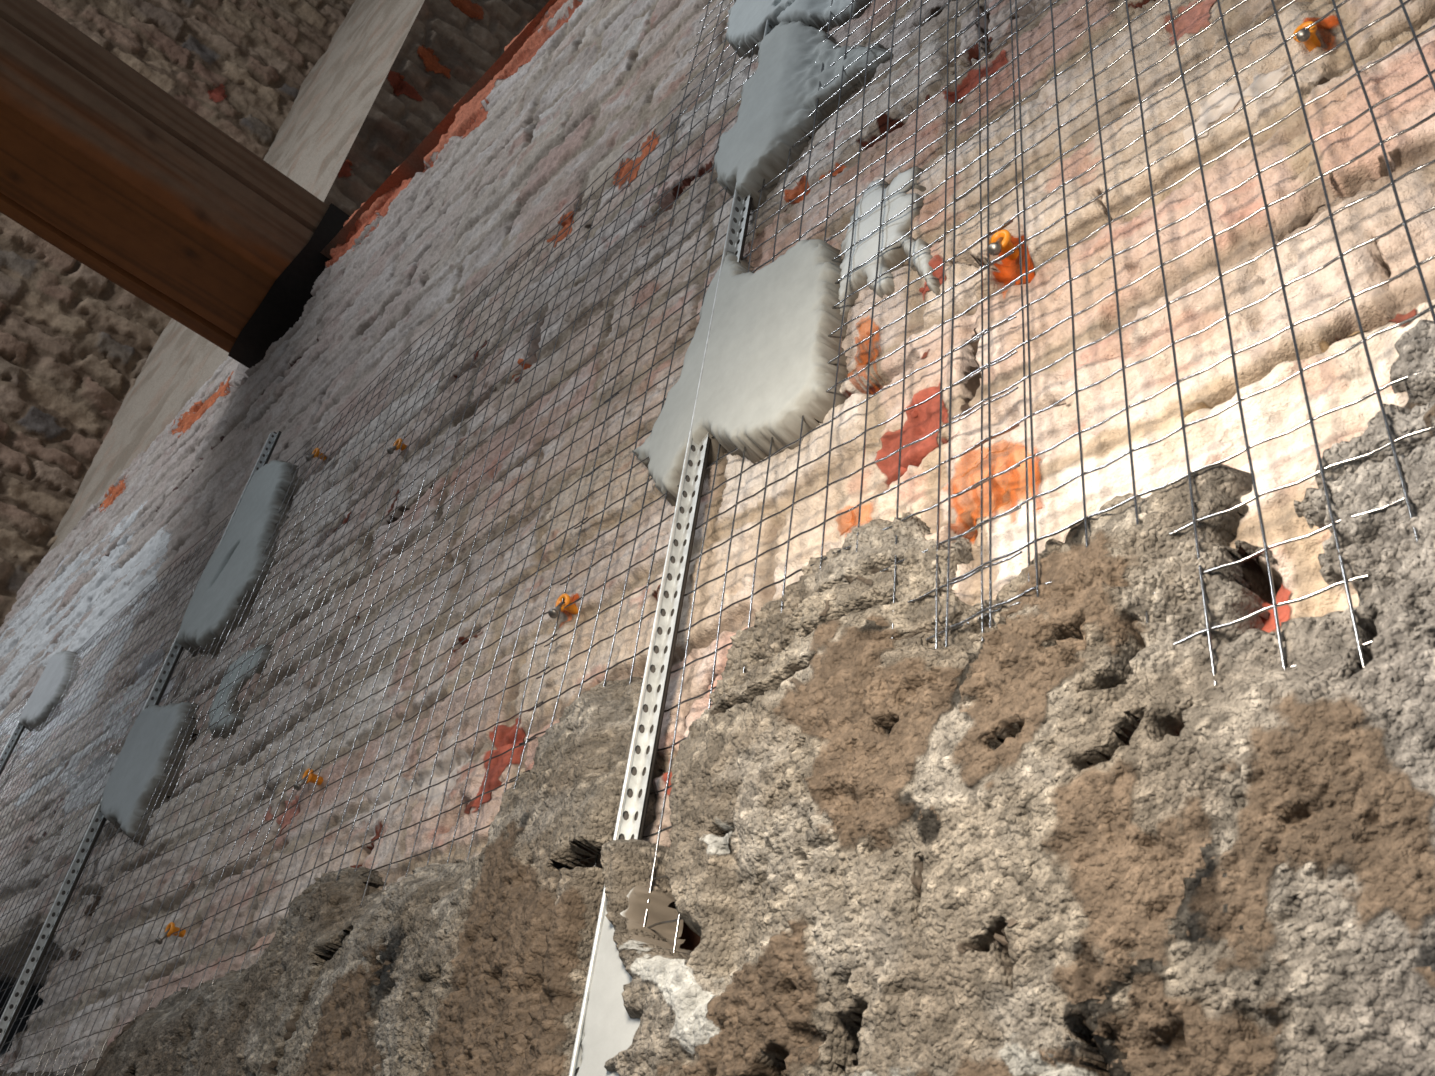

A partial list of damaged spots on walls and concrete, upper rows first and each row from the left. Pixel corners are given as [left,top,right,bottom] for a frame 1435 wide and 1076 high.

spalling [325,0,583,268]
spalling [875,383,949,485]
spalling [464,717,526,814]